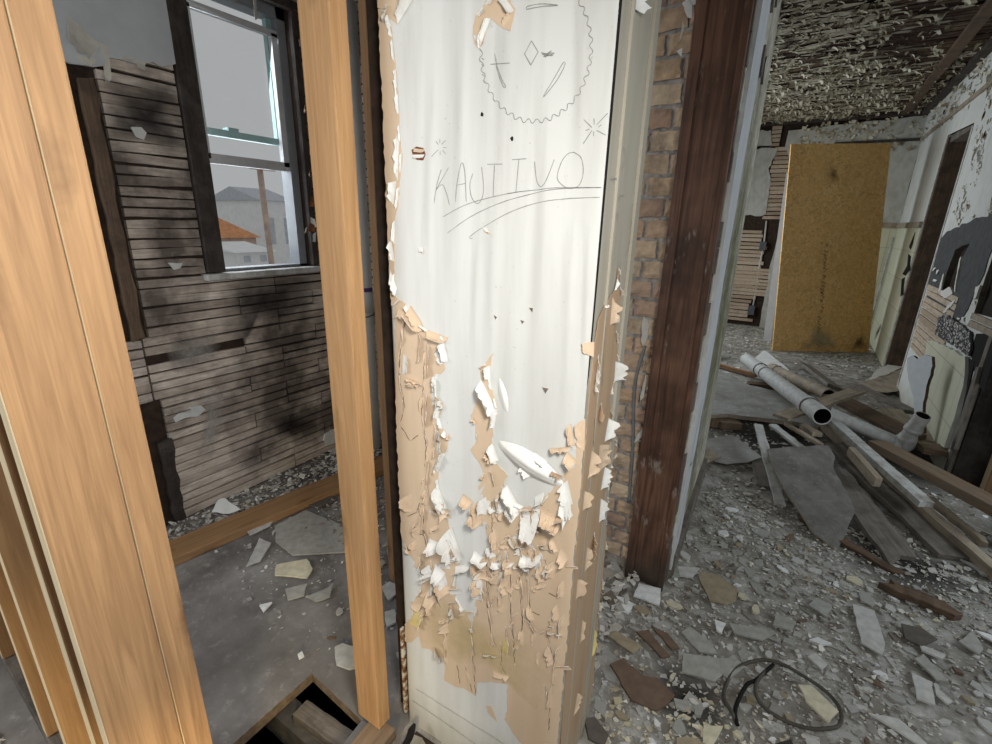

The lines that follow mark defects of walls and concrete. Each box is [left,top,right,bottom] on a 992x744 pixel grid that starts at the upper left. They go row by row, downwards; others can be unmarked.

peeling [677,0,696,57]
peeling [758,0,992,225]
spalling [931,247,968,321]
spalling [972,280,992,316]
peeling [377,0,675,744]
flaking render [678,566,700,579]
flaking render [682,653,738,683]